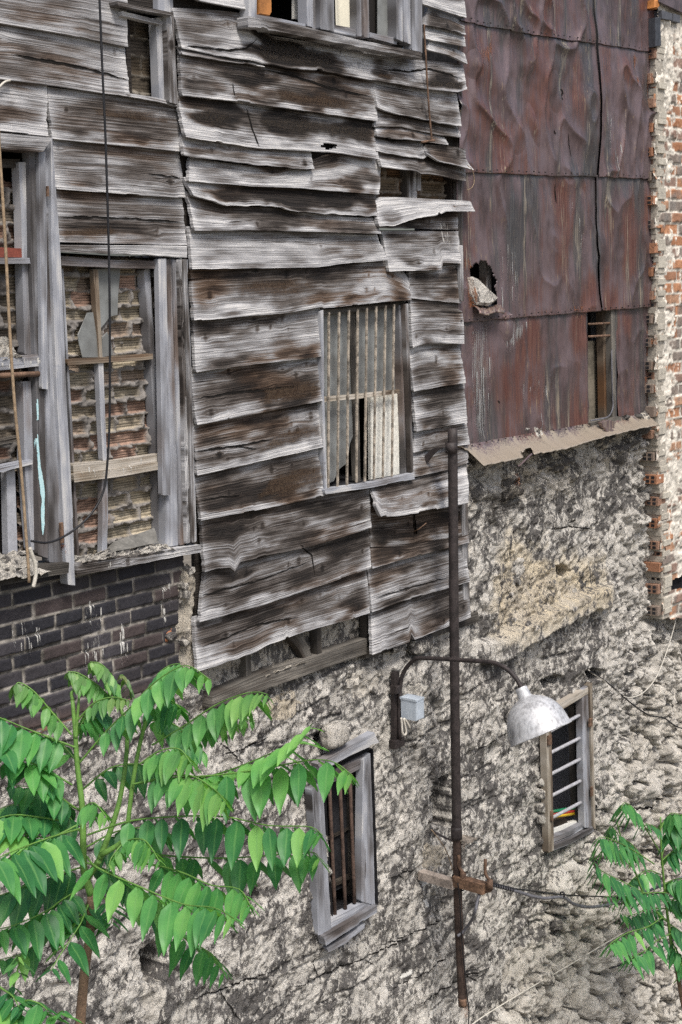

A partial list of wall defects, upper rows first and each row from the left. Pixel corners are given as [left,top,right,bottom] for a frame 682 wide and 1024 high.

spalling [613,35,672,619]